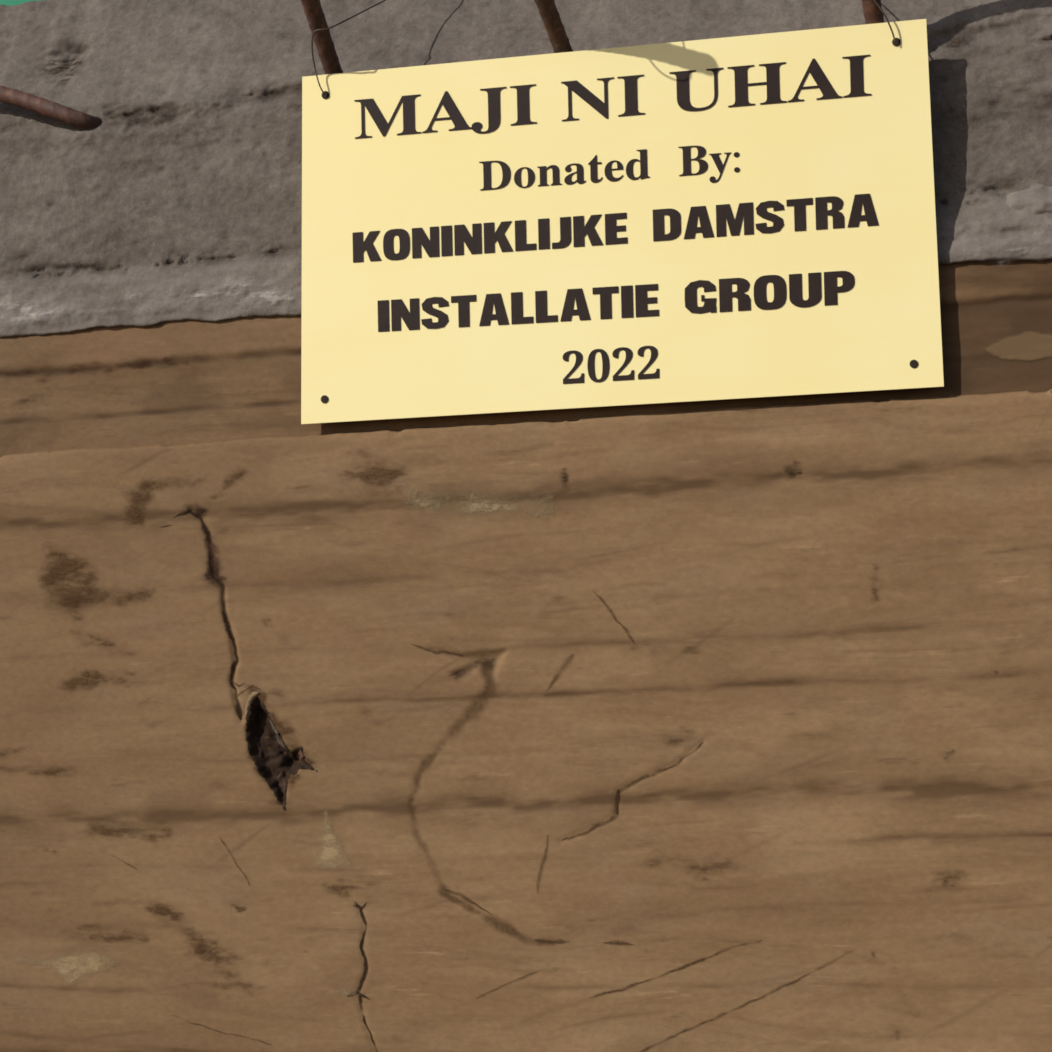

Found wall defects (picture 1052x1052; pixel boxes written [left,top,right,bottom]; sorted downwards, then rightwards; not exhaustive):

crack [162,510,260,720]
crack [541,742,703,867]
crack [347,902,374,1044]
crack [441,888,569,943]